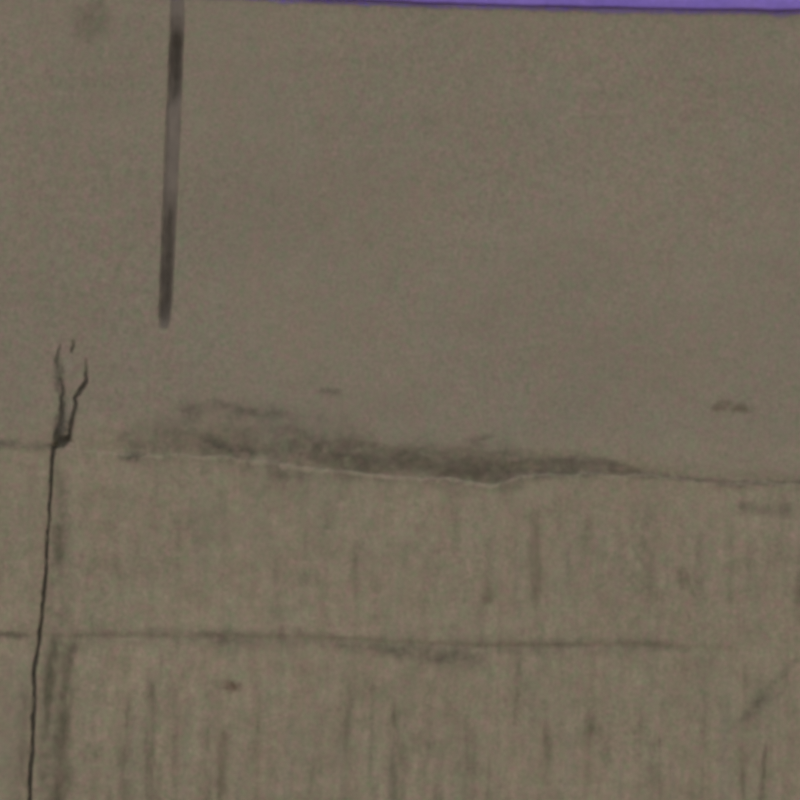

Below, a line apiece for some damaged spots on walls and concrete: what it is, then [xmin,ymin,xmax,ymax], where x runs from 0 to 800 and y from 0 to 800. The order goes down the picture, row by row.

crack [28,371,88,800]